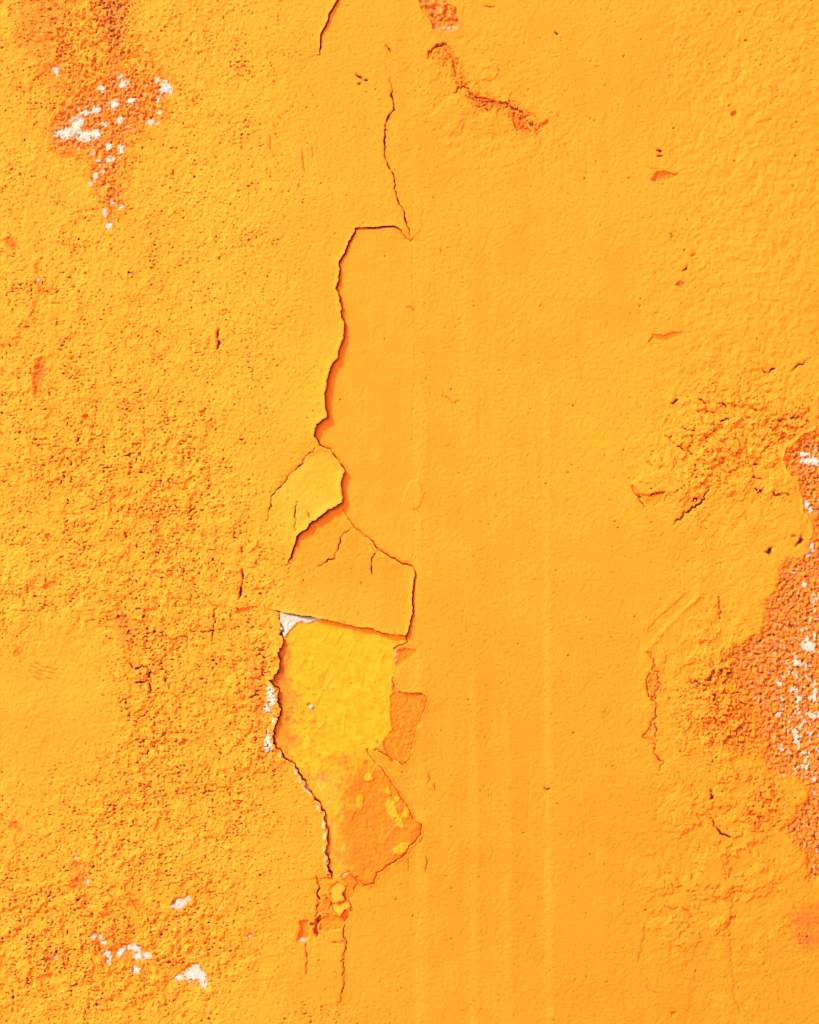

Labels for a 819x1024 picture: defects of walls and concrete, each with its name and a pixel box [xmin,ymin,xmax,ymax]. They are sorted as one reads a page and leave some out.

crack [316,0,338,54]
peeling [419,0,549,137]
crack [356,75,410,234]
spalling [633,356,819,886]
peeling [263,612,430,941]